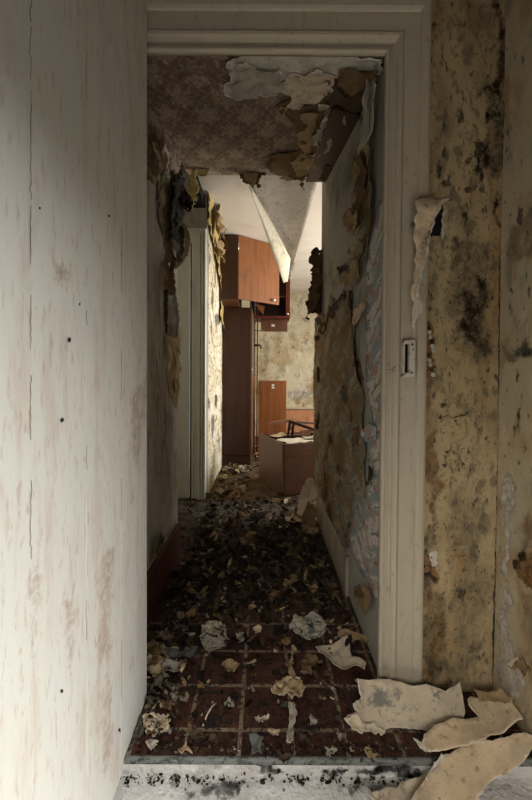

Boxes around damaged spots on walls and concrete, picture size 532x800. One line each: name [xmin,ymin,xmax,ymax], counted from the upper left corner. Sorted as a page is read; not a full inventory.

peeling [223,56,384,110]
water stain [465,142,485,173]
spalling [429,204,447,239]
water stain [461,279,486,343]
spalling [355,357,364,386]